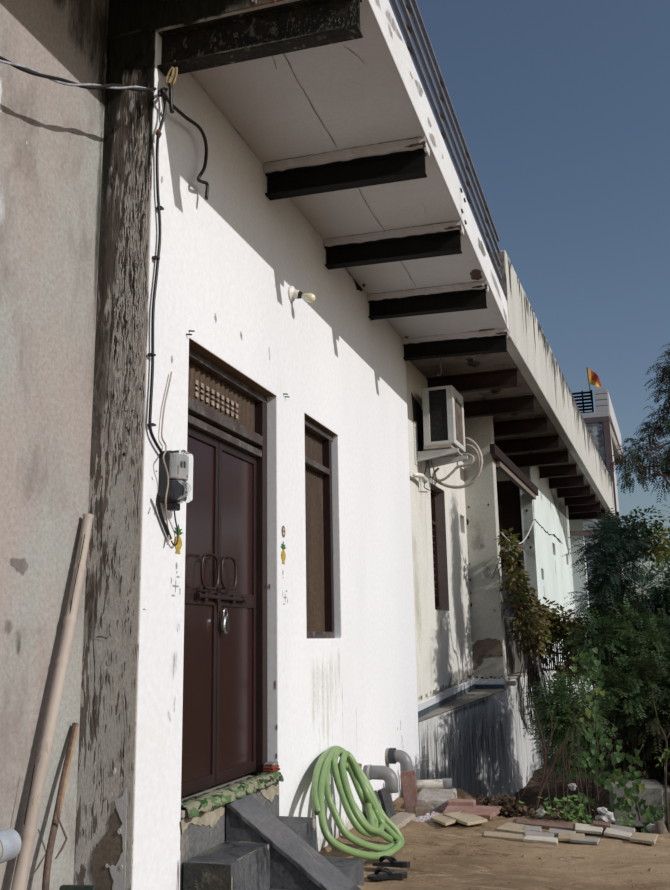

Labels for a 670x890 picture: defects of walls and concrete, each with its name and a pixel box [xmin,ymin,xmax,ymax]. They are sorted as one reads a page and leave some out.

damp [73,0,246,305]
crack [265,54,423,163]
damp [93,317,112,429]
damp [88,575,97,639]
flaking render [472,638,503,679]
flaking render [82,651,135,890]
damp [422,693,534,794]